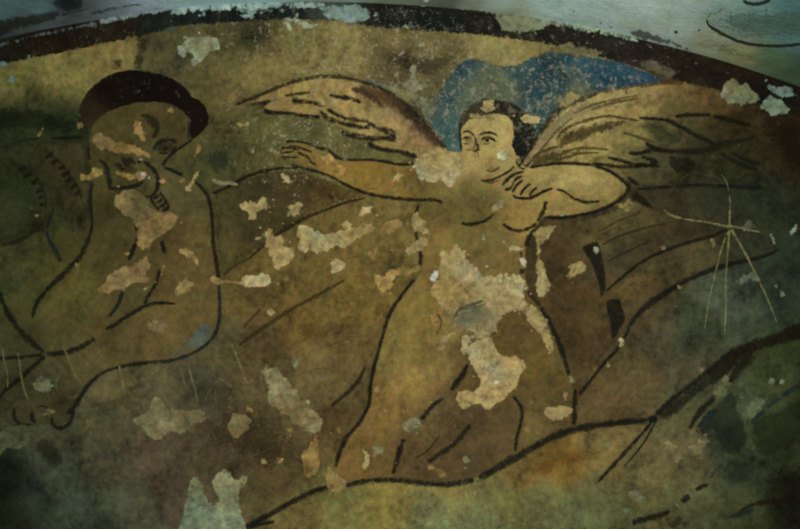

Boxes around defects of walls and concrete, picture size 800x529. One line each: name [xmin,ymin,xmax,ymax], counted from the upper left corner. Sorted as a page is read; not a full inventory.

peeling [177,12,220,67]
peeling [715,78,797,116]
peeling [92,121,151,160]
peeling [392,146,464,188]
peeling [97,170,183,294]
peeling [210,196,431,287]
peeling [373,265,420,295]
peeling [428,225,556,410]
peeling [132,396,206,440]
peeling [261,356,346,496]
peeling [544,391,573,421]
peeling [179,469,248,529]